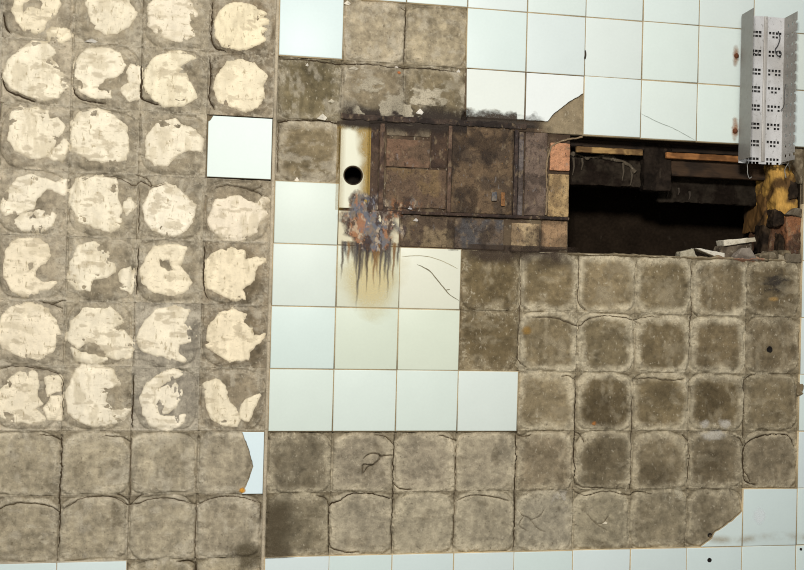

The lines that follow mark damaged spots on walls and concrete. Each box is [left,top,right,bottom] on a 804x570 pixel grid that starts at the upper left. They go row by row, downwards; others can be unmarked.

spalling [0,0,584,570]
rust [341,191,419,285]
crack [402,255,459,301]
spalling [266,139,804,556]
crack [319,435,410,553]